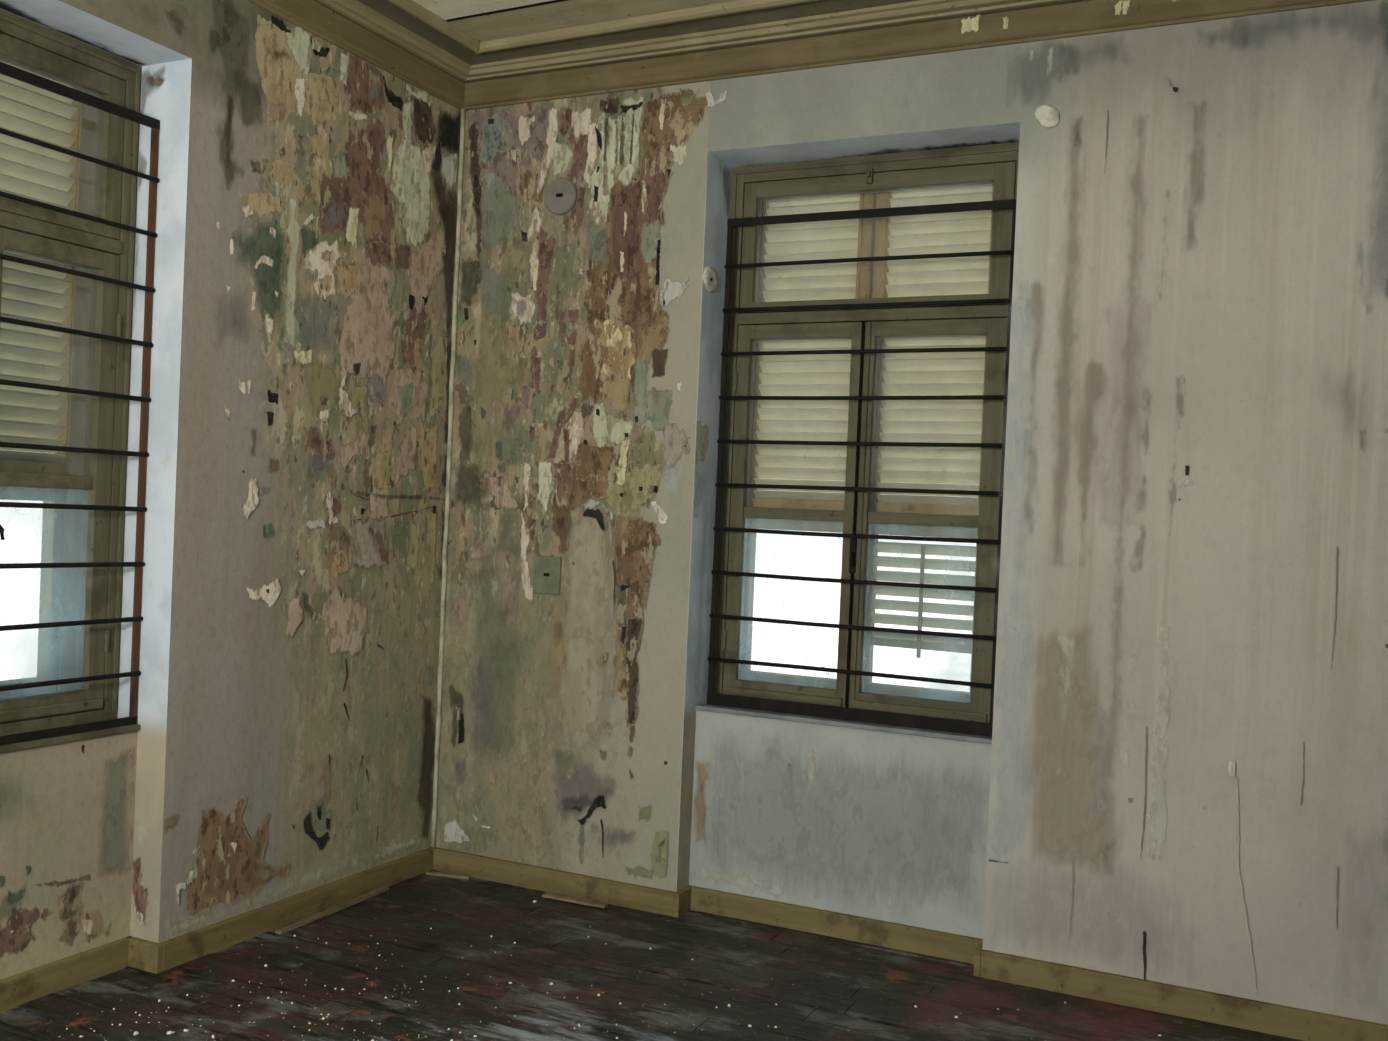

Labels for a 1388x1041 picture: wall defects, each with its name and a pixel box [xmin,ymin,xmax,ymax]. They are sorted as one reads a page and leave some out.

peeling [238,14,728,656]
spalling [613,514,661,728]
crack [1330,547,1338,665]
leakage [1036,636,1105,864]
crack [1298,742,1306,803]
spalling [0,866,111,958]
spalling [132,857,149,926]
spalling [175,797,290,916]
crack [1333,867,1341,938]